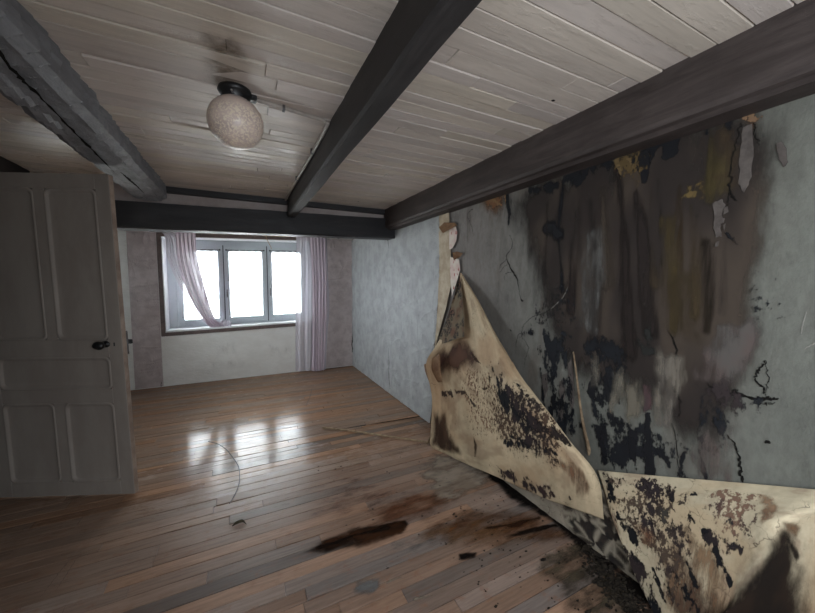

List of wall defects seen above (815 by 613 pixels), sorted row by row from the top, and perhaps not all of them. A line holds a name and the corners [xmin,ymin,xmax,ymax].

crack [0,50,144,193]
peeling [713,199,729,247]
damp [309,117,800,613]